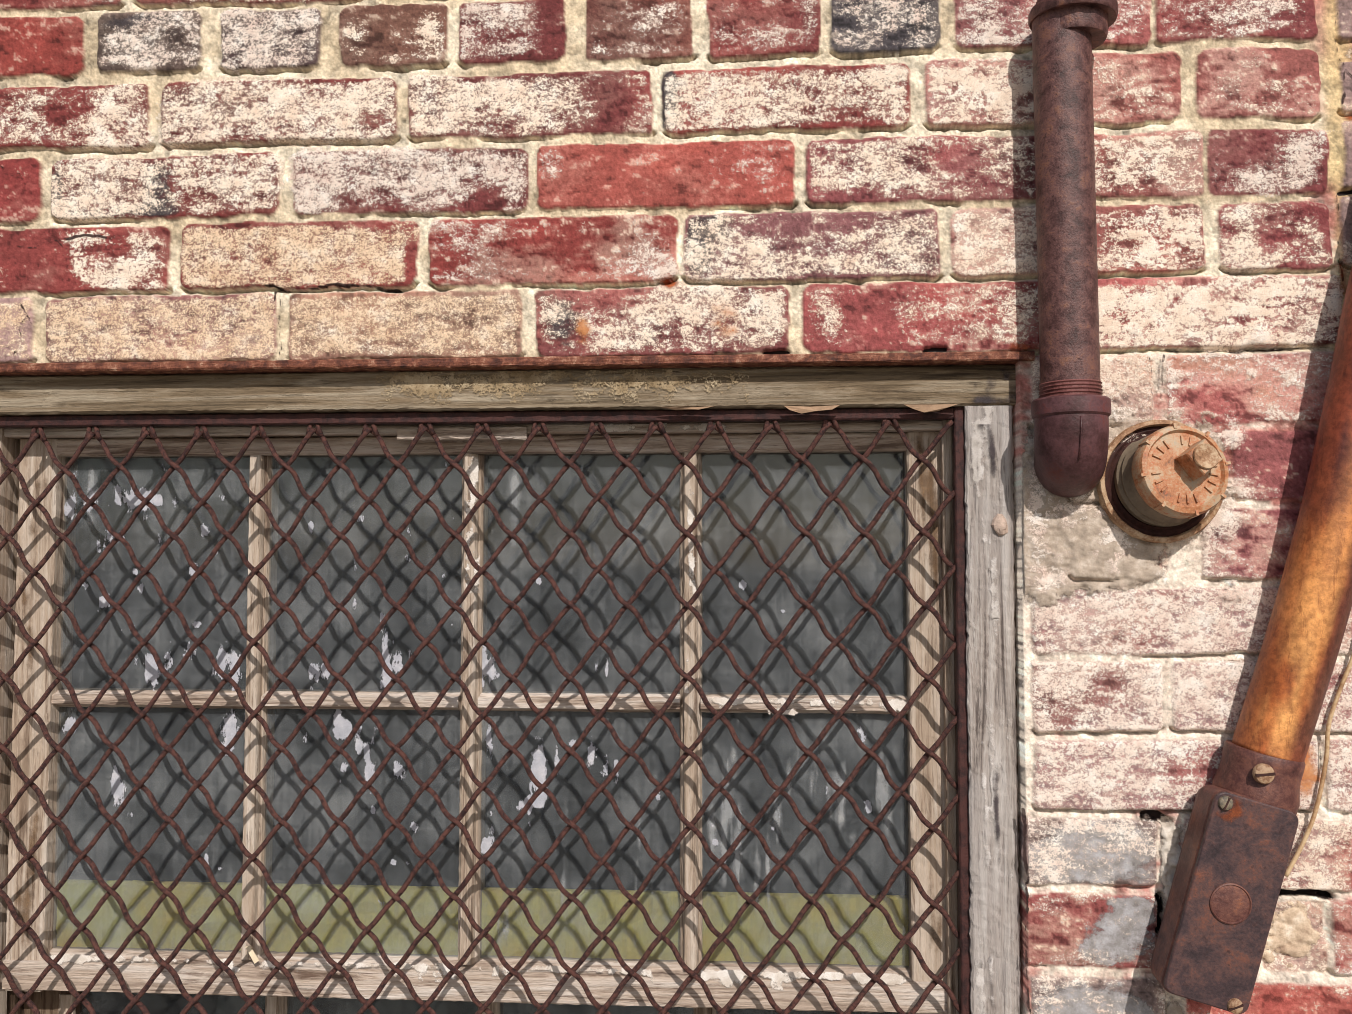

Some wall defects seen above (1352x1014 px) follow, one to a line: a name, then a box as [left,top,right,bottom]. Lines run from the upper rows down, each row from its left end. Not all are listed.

crack [264,282,403,355]